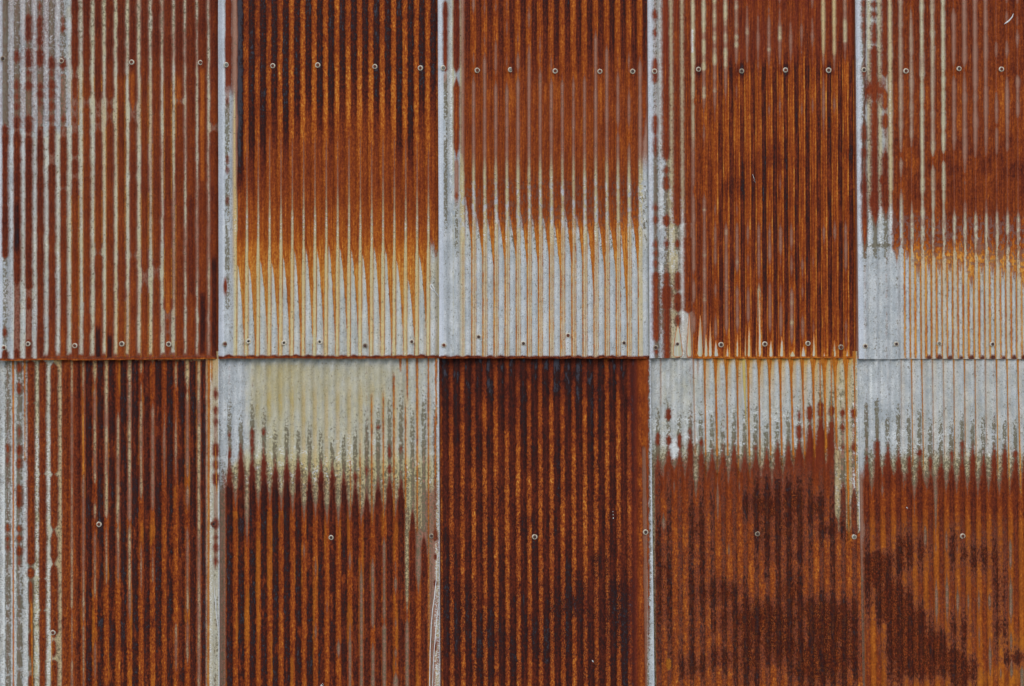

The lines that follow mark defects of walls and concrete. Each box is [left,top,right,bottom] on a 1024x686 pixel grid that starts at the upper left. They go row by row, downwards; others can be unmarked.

rust [0,0,650,686]
rust [652,0,1024,686]